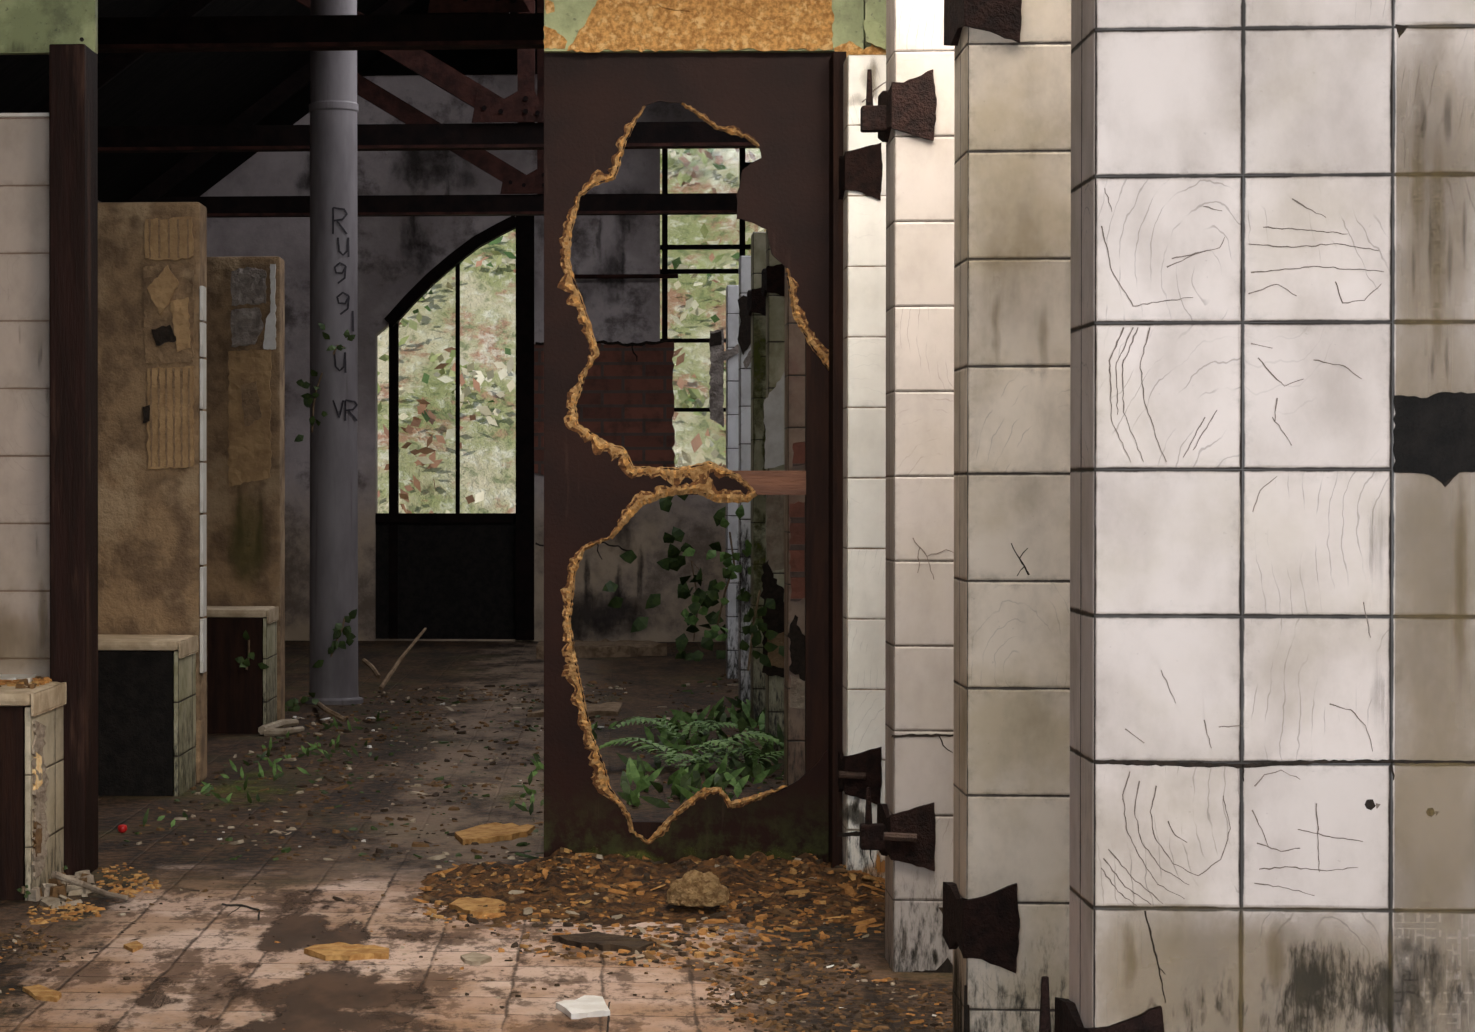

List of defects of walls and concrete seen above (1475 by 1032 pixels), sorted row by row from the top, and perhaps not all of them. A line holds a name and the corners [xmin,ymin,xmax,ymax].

peeling [543,0,886,57]
crack [1101,188,1384,462]
flaking render [576,342,675,468]
spalling [763,372,805,469]
crack [1251,343,1362,512]
water stain [571,563,637,641]
spalling [760,495,805,709]
crack [1329,704,1373,751]
water stain [1394,476,1475,914]
crack [1101,728,1363,1003]
water stain [193,889,441,1032]
water stain [1115,934,1473,1032]